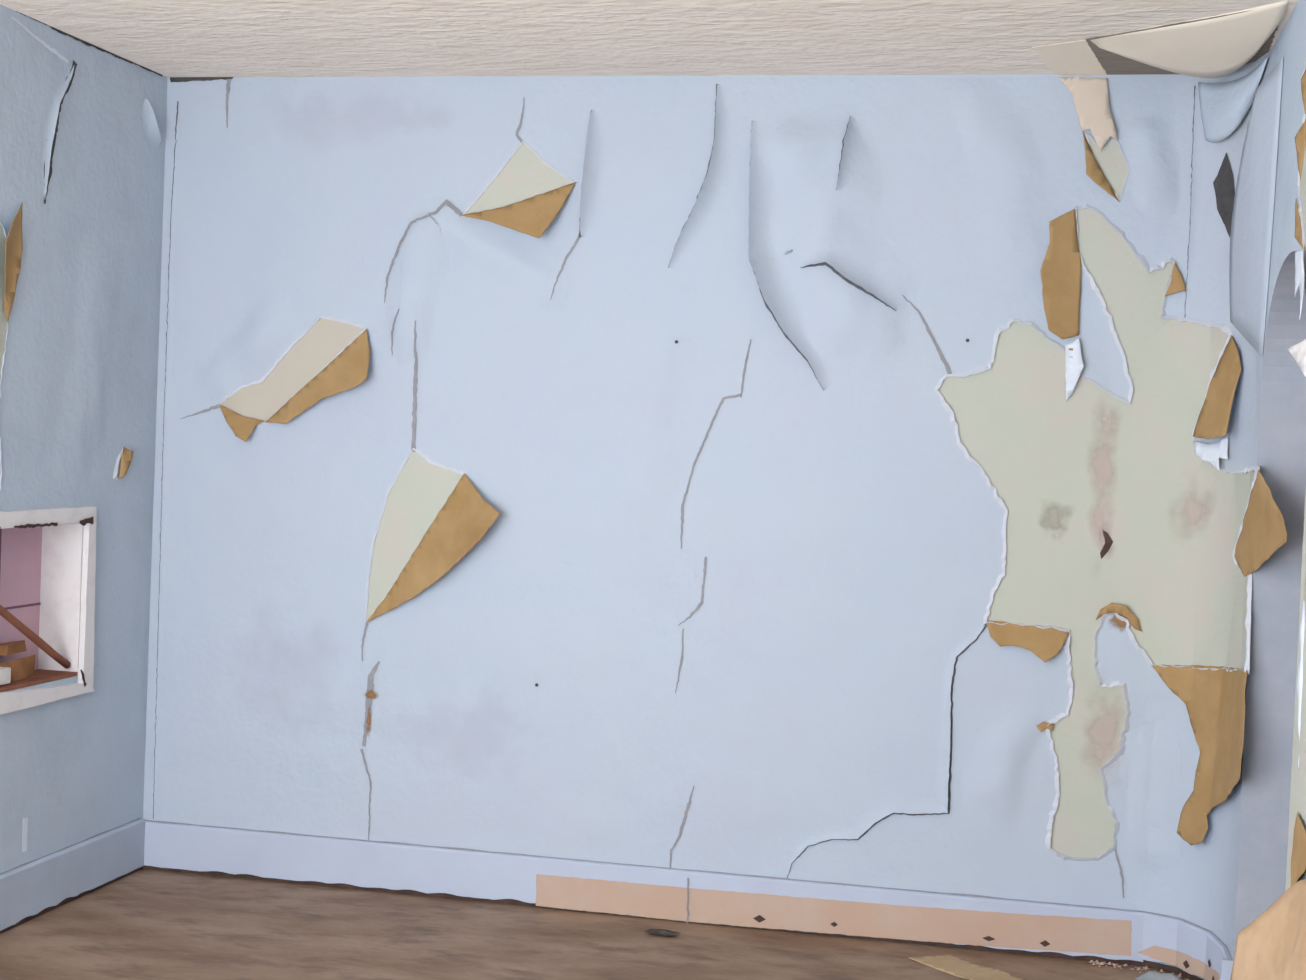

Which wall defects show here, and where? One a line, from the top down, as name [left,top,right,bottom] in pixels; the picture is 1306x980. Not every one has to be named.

crack [11,11,233,128]
peeling [1085,0,1288,78]
peeling [181,316,370,442]
peeling [384,97,578,355]
crack [550,233,581,300]
crack [902,295,952,374]
peeling [361,321,500,661]
crack [675,339,751,693]
peeling [934,204,1287,861]
crack [360,661,380,841]
peeling [1285,490,1306,891]
crack [670,786,694,923]